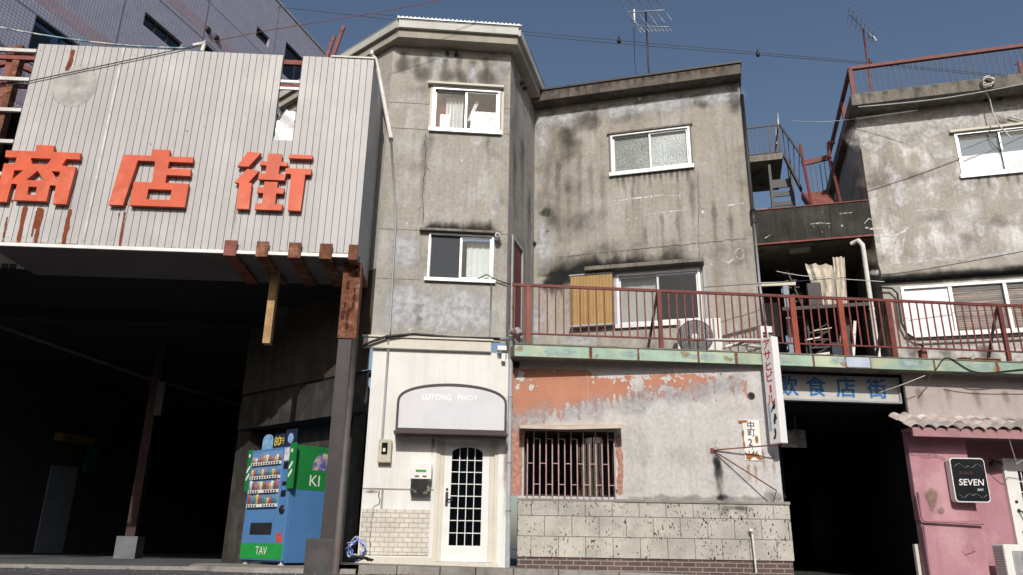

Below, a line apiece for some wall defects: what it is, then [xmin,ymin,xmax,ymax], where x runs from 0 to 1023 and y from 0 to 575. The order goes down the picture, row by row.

damp [418,53,500,83]
rust [16,206,44,243]
rust [61,209,72,244]
damp [537,224,550,257]
damp [544,258,644,289]
rust [341,256,360,329]
damp [533,309,543,336]
damp [548,338,591,353]
peeling [511,368,748,496]
damp [713,456,722,479]